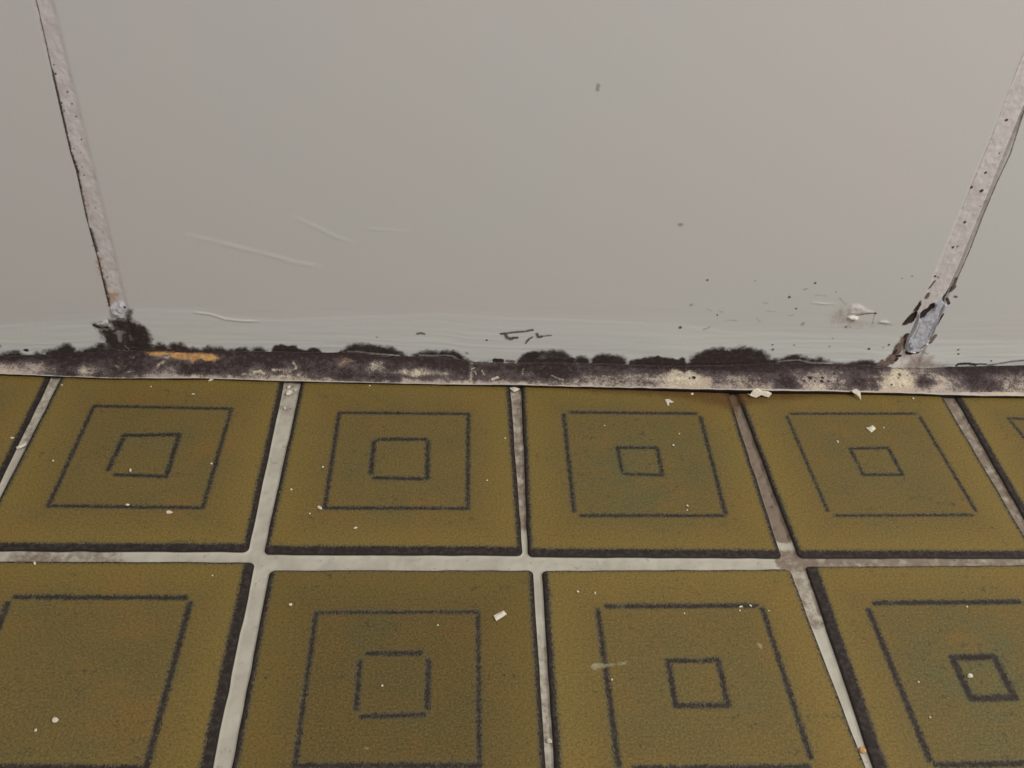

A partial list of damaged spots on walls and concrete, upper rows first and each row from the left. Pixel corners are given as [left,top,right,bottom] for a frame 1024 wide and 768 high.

water stain [0,310,1024,392]